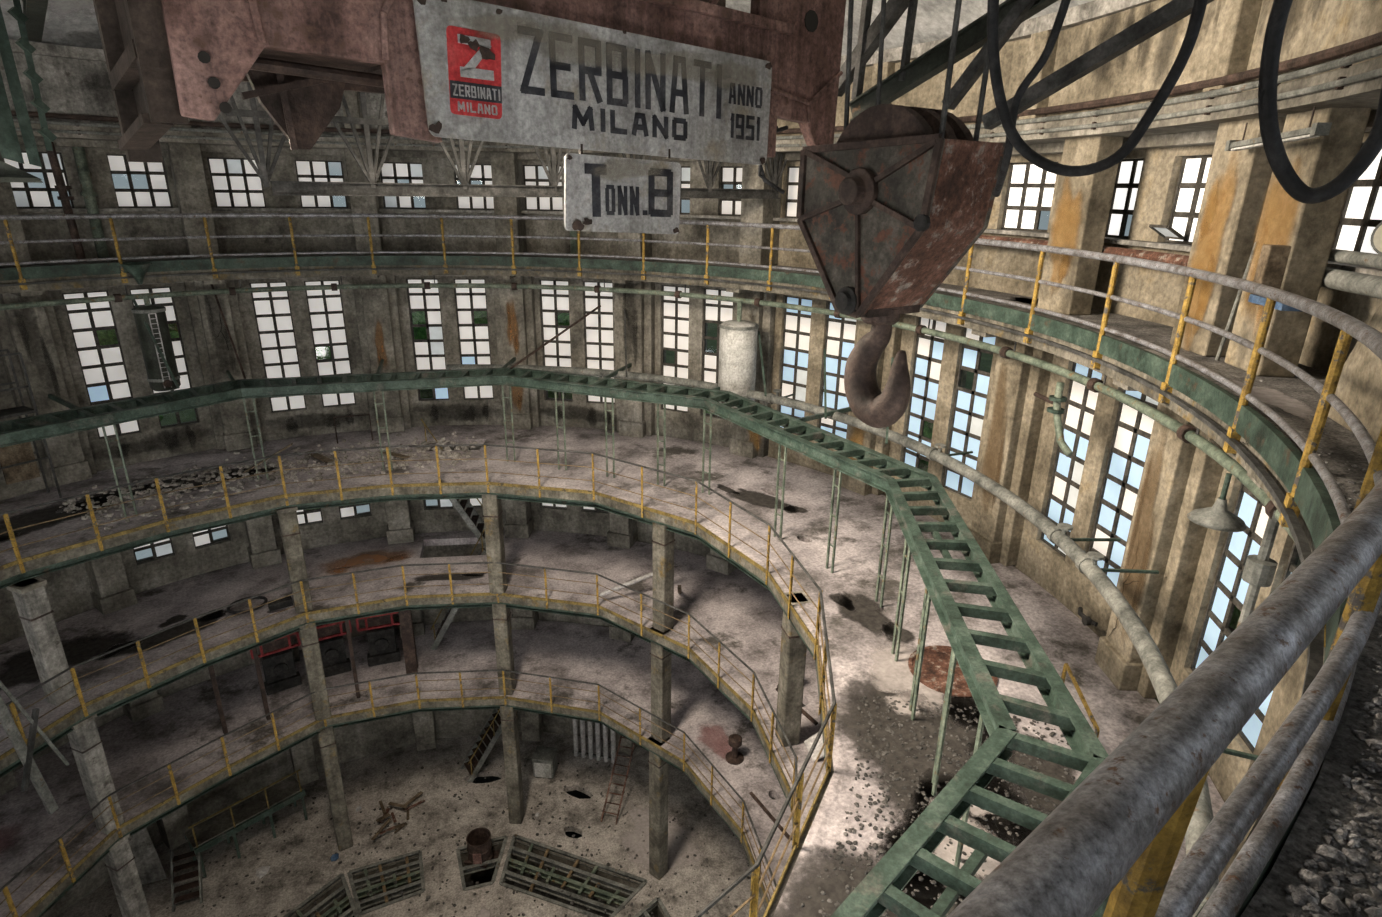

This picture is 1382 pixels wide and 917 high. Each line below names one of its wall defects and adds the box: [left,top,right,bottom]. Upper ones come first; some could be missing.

water stain [717,484,807,513]
water stain [758,593,989,917]
water stain [1008,750,1075,785]
water stain [986,776,1063,815]
water stain [960,805,1032,847]